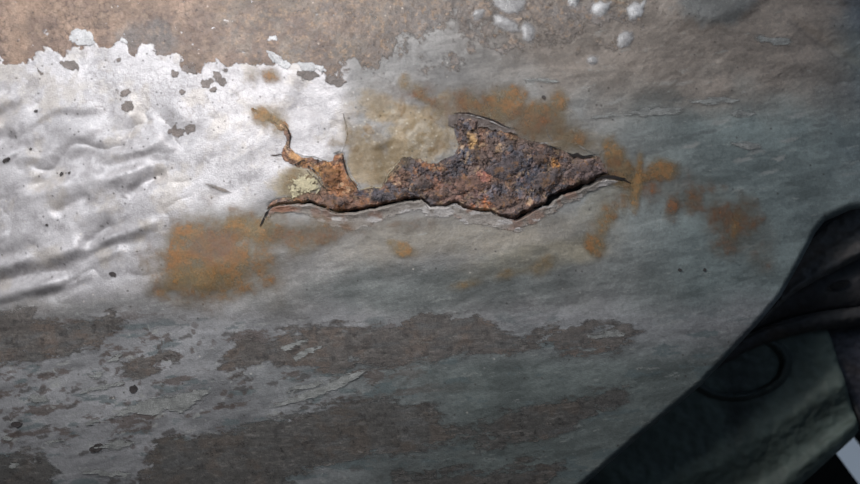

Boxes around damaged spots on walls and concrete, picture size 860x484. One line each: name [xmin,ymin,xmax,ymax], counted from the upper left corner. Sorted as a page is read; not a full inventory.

peeling [120,88,134,112]
peeling [168,124,196,137]
crack [251,108,631,232]
corrosion [585,138,674,256]
corrosion [155,209,328,299]